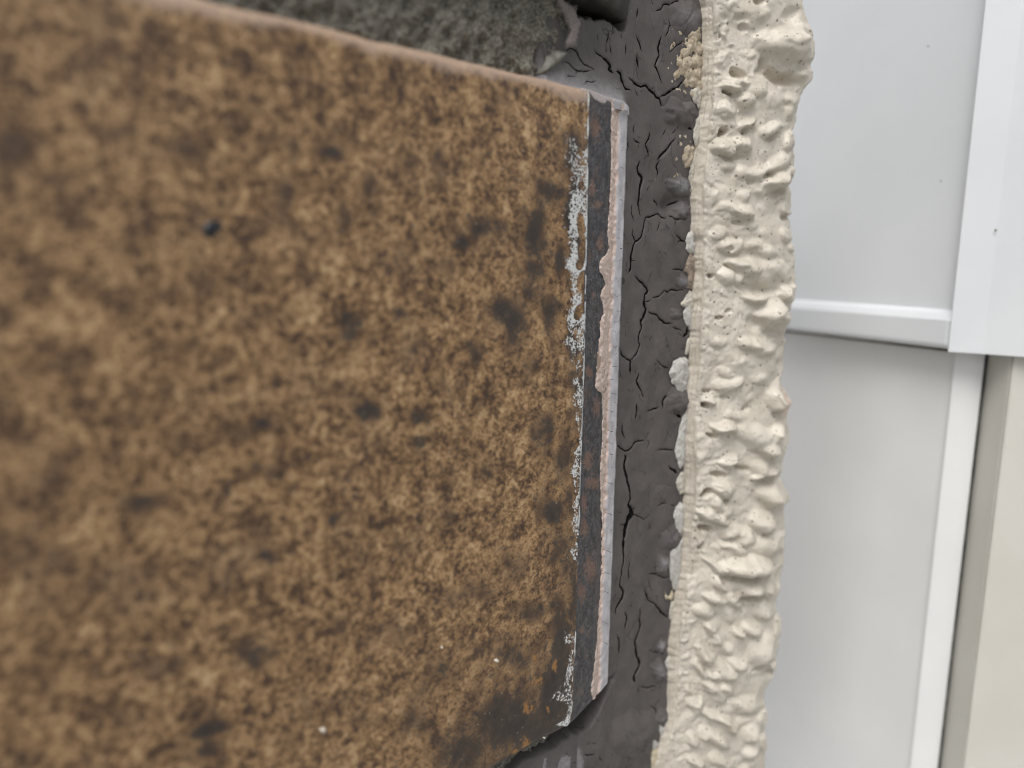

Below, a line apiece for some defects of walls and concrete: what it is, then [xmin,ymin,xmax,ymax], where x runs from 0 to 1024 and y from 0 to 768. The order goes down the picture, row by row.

leakage [561,86,612,560]
crack [565,0,693,714]
leakage [553,632,576,726]